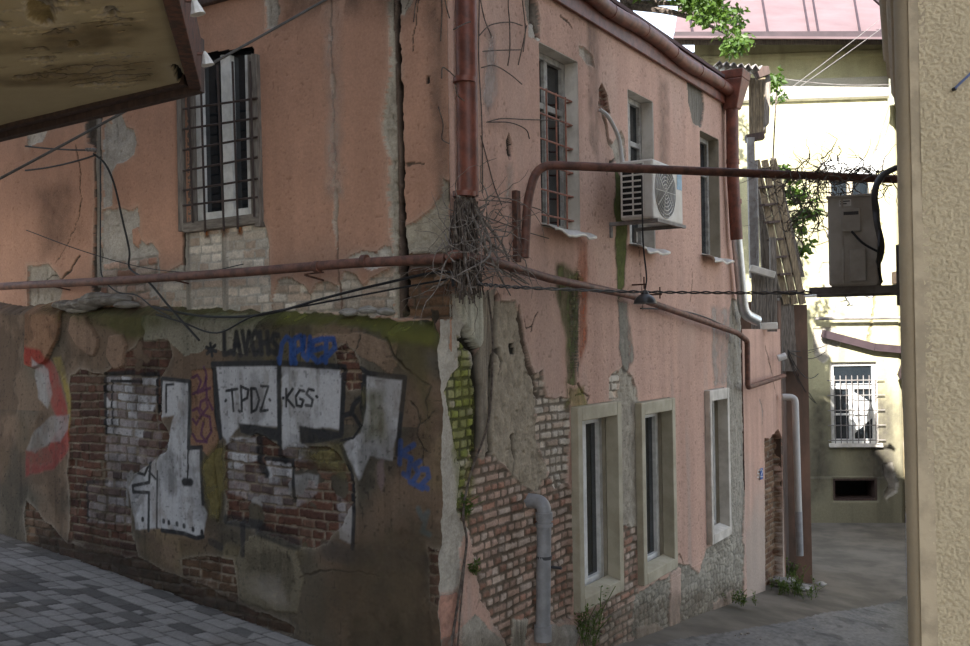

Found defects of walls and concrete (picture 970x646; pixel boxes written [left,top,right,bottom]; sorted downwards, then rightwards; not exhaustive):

crack [404,0,420,52]
crack [329,0,344,315]
crack [405,160,425,168]
flaking render [24,114,639,646]
crack [385,336,435,467]